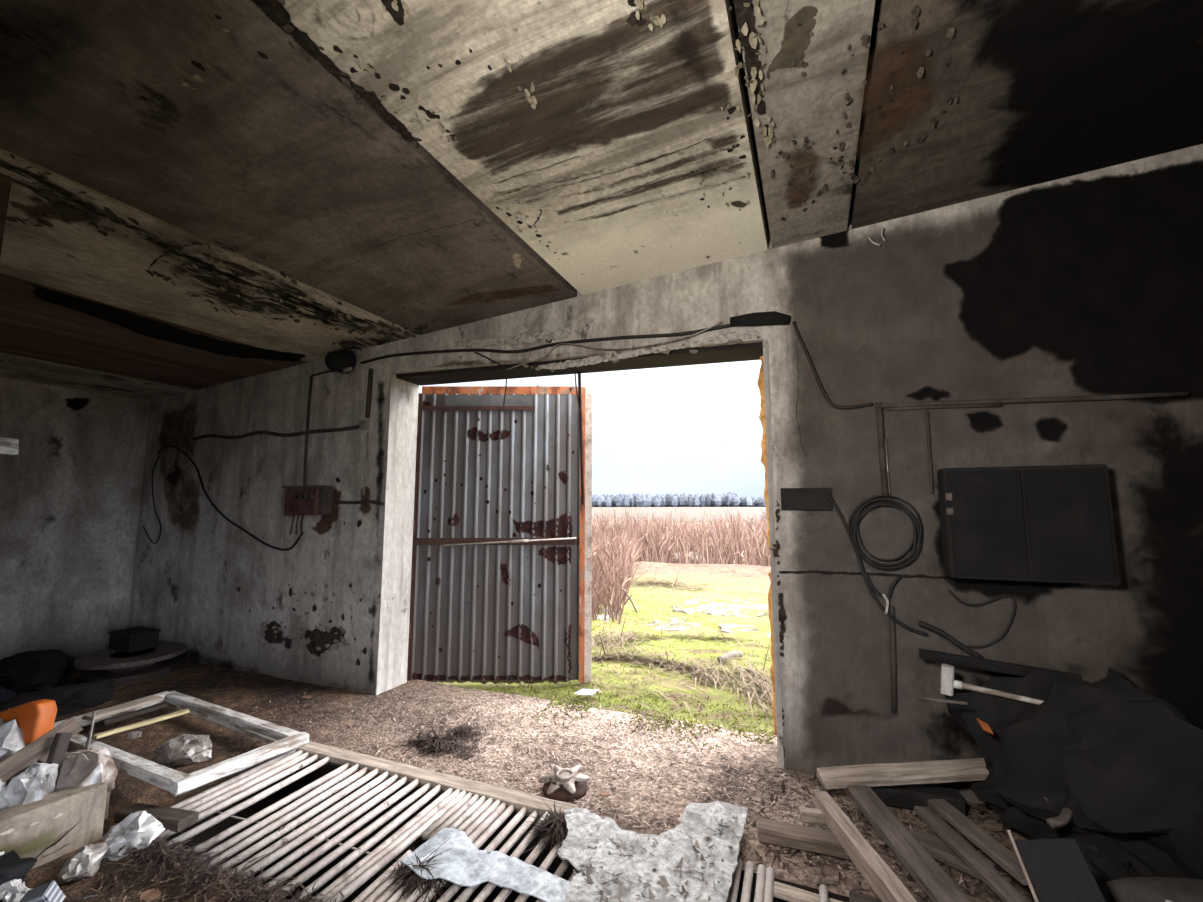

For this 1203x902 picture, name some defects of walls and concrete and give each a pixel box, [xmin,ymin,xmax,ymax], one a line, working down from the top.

peeling [627,0,647,26]
spalling [252,0,457,147]
water stain [450,0,730,202]
peeling [4,189,120,237]
water stain [557,135,746,220]
peeling [146,241,435,351]
corrosion [313,488,341,534]
flaking render [256,583,367,666]